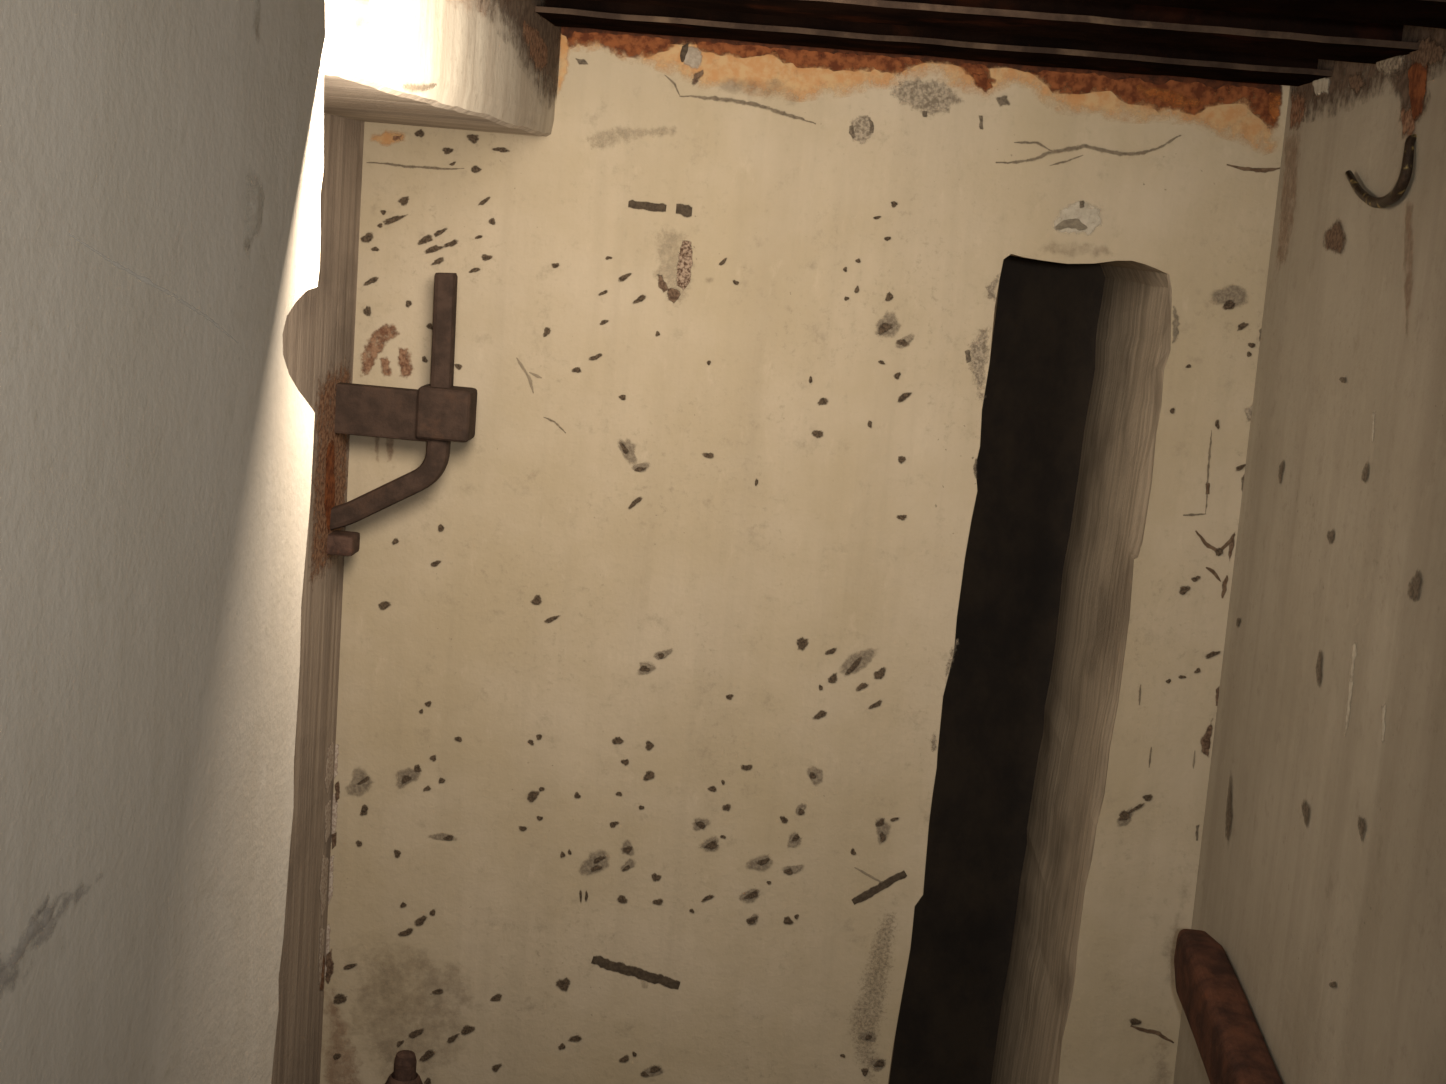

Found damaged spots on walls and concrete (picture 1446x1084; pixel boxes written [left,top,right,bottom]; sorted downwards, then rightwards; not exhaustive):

rust [480,0,1306,149]
peeling [893,79,959,117]
rust [1400,62,1428,136]
crack [996,135,1181,166]
spalling [1054,201,1101,235]
spalling [633,241,693,303]
rust [311,324,413,581]